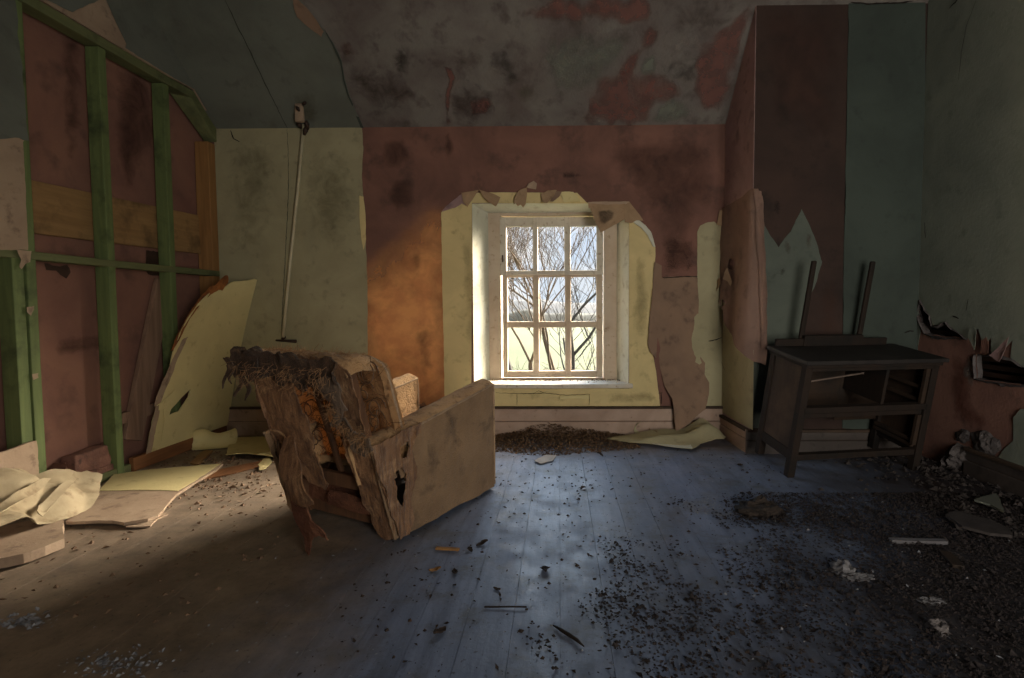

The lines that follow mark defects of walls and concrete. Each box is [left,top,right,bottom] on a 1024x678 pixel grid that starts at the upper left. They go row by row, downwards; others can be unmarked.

flaking render [917,300,968,340]
flaking render [973,353,1024,387]